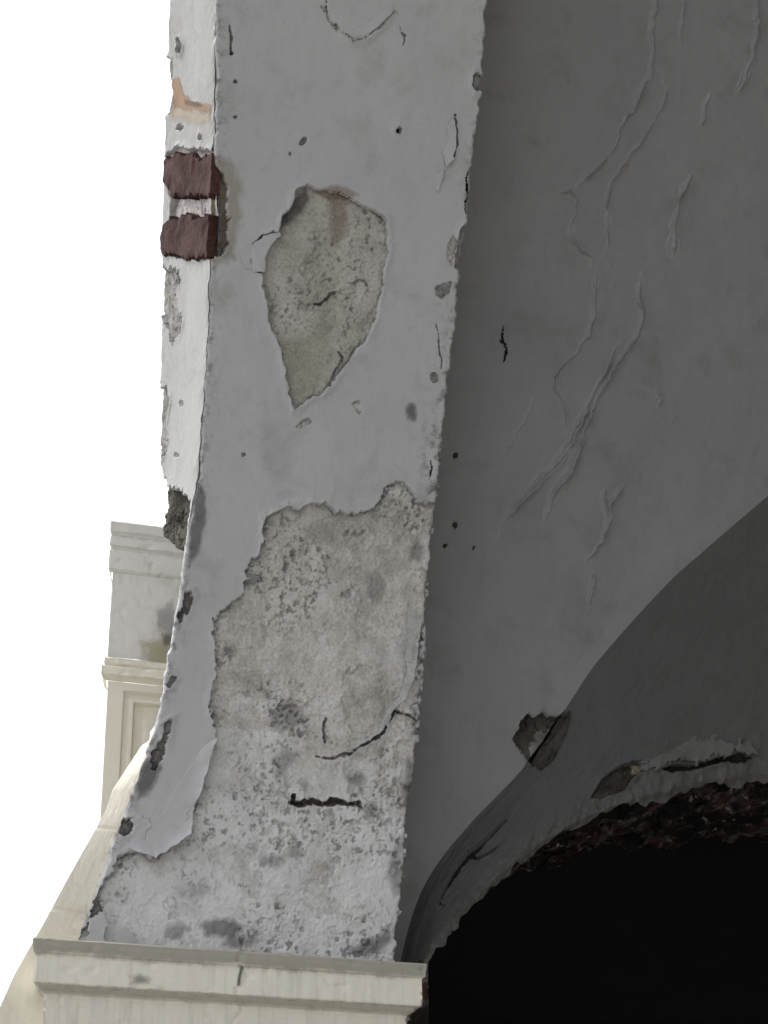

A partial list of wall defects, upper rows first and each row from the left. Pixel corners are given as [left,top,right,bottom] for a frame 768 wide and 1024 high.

crack [320,0,407,46]
flaking render [160,148,228,262]
flaking render [239,186,389,409]
crack [500,326,508,362]
flaking render [78,481,435,962]
crack [315,708,416,760]
flaking render [512,712,571,770]
peeling [590,734,761,799]